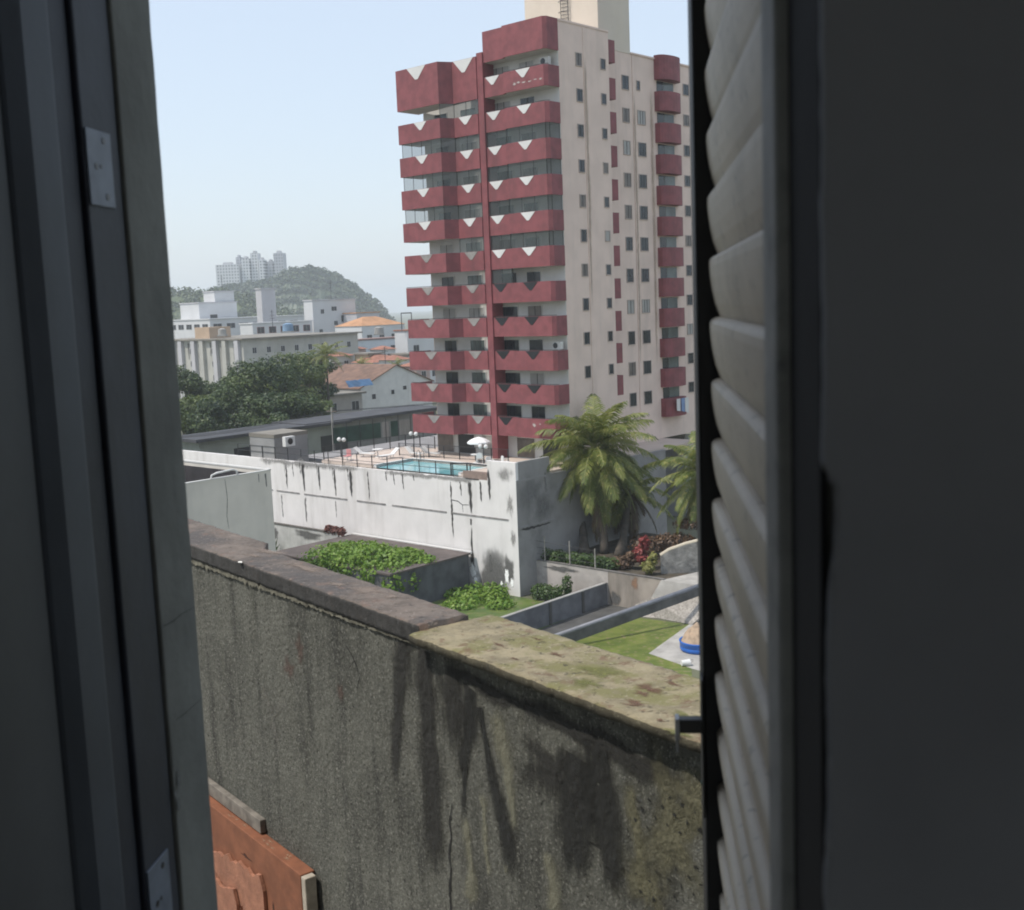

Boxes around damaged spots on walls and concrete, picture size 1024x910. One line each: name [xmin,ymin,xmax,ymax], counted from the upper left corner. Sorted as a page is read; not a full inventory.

water stain [385,470,513,590]
water stain [391,637,667,910]
crack [446,804,454,910]